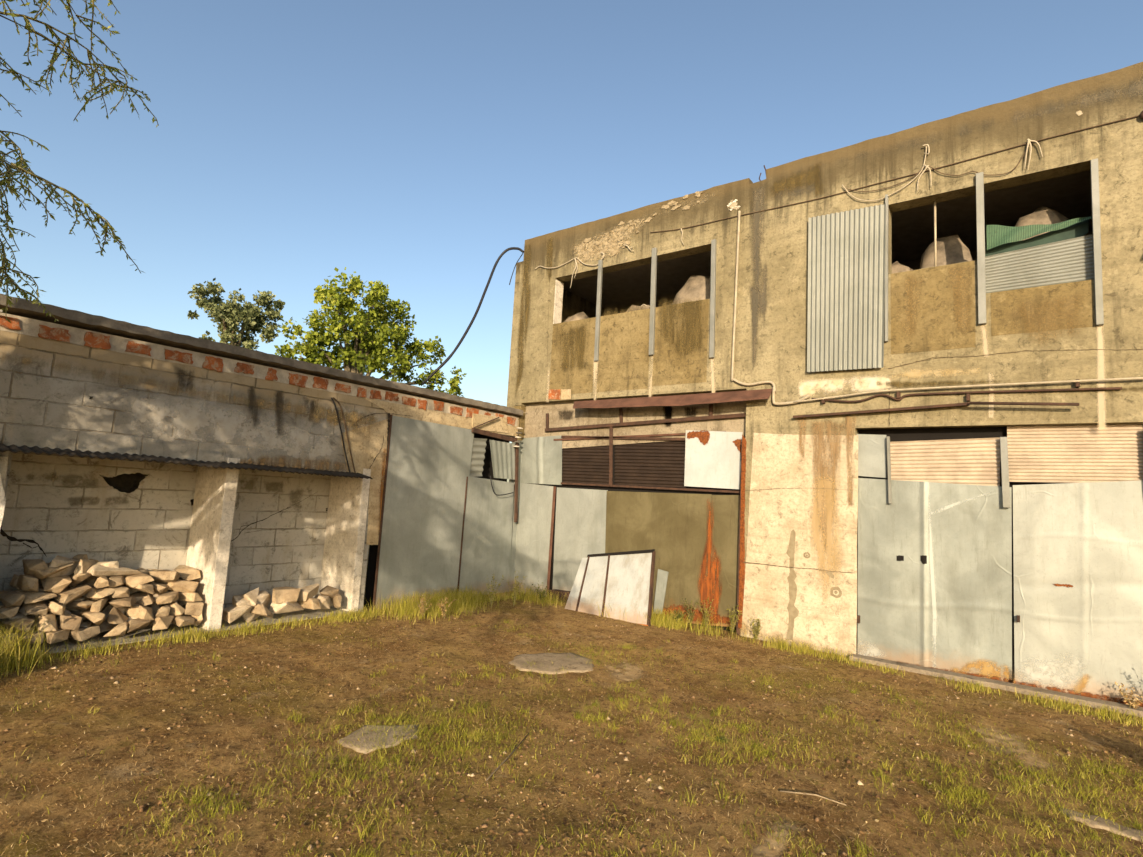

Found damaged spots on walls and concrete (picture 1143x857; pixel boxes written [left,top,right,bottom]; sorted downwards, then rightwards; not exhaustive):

flaking render [575,191,703,264]
rust [687,430,710,445]
crack [0,526,47,557]
rust [656,435,747,629]